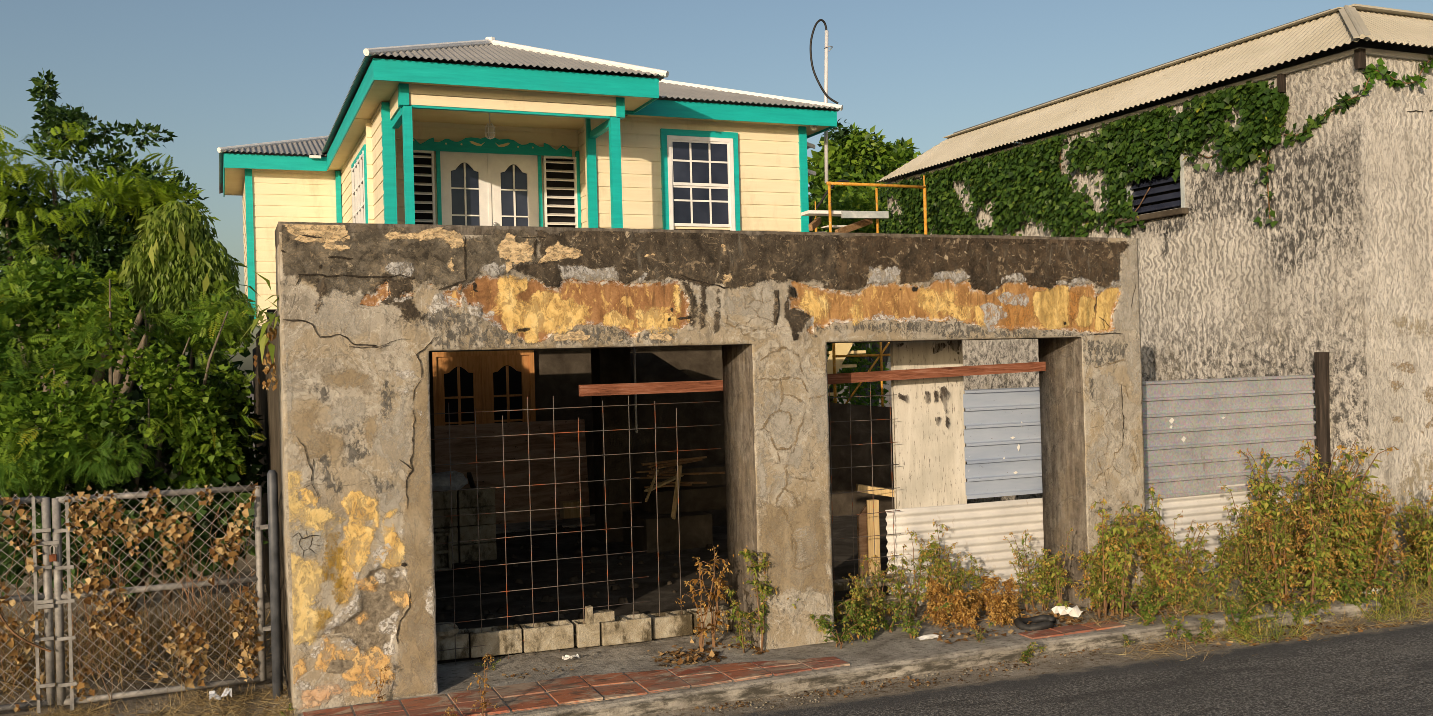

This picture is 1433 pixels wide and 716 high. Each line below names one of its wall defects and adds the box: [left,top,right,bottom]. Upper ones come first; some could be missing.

peeling [284,224,350,251]
crack [281,234,467,290]
flaking render [360,227,692,344]
flaking render [788,266,1121,334]
peeling [933,340,961,354]
crack [283,319,435,508]
flaking render [288,396,721,710]
crack [396,562,411,643]